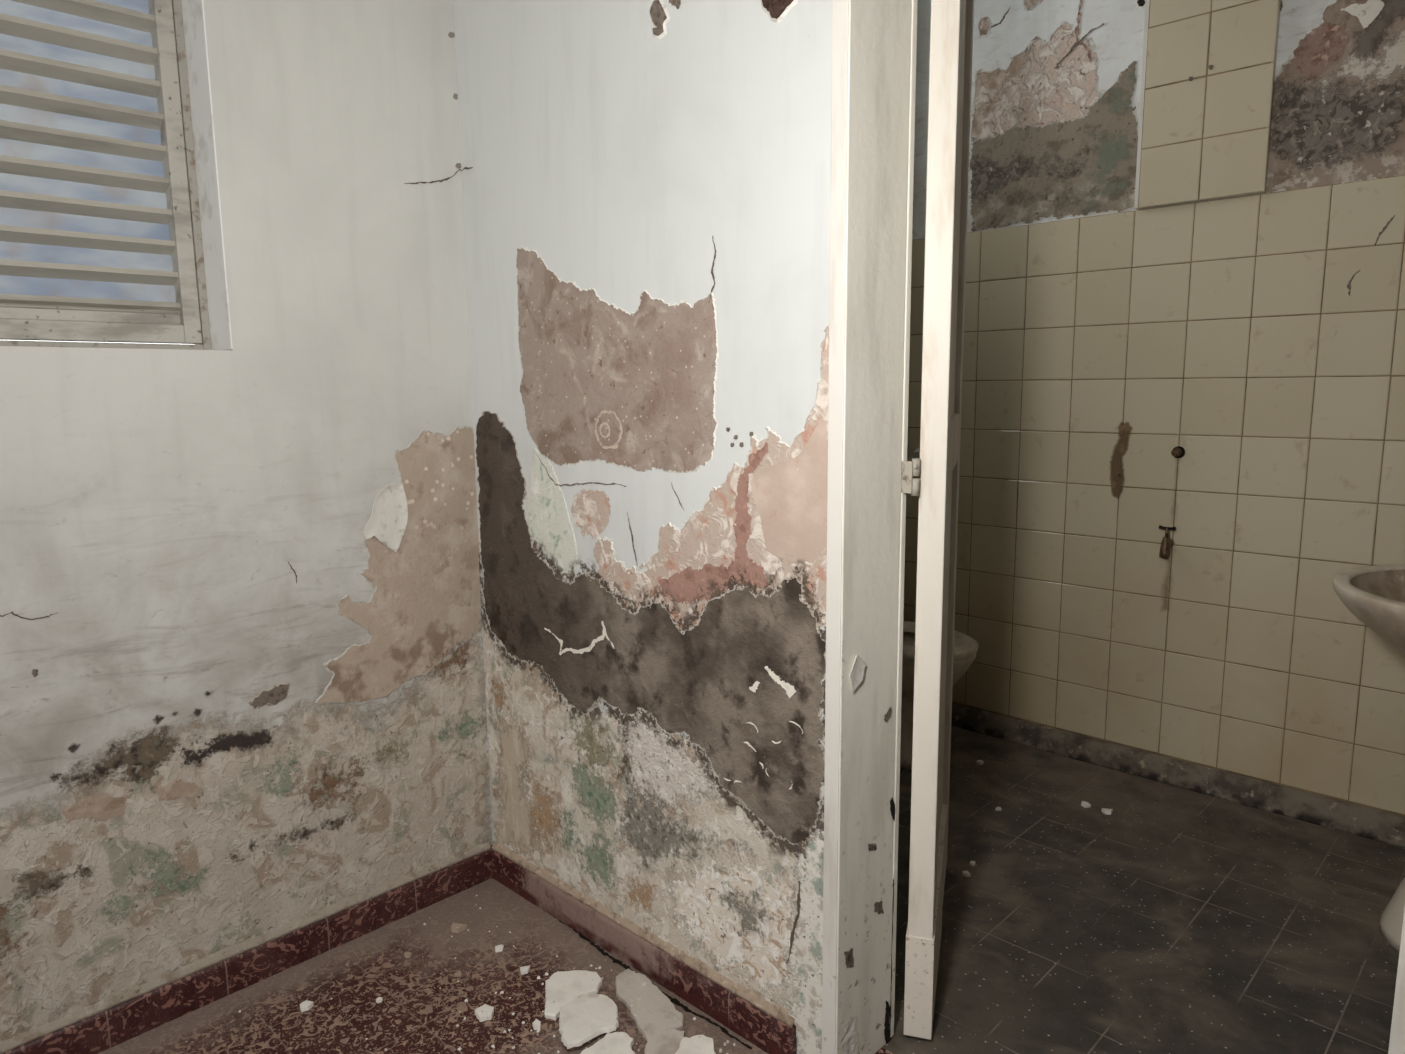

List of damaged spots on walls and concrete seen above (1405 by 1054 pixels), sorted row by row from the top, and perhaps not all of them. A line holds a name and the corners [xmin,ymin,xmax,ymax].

spalling [649,0,681,40]
spalling [760,0,798,23]
flaking render [969,0,1138,231]
peeling [1262,0,1405,194]
crack [404,167,473,184]
corrosion [1110,423,1132,498]
peeling [0,236,829,1054]
leakage [50,712,417,862]
leakage [102,848,207,922]
peeling [844,947,854,969]